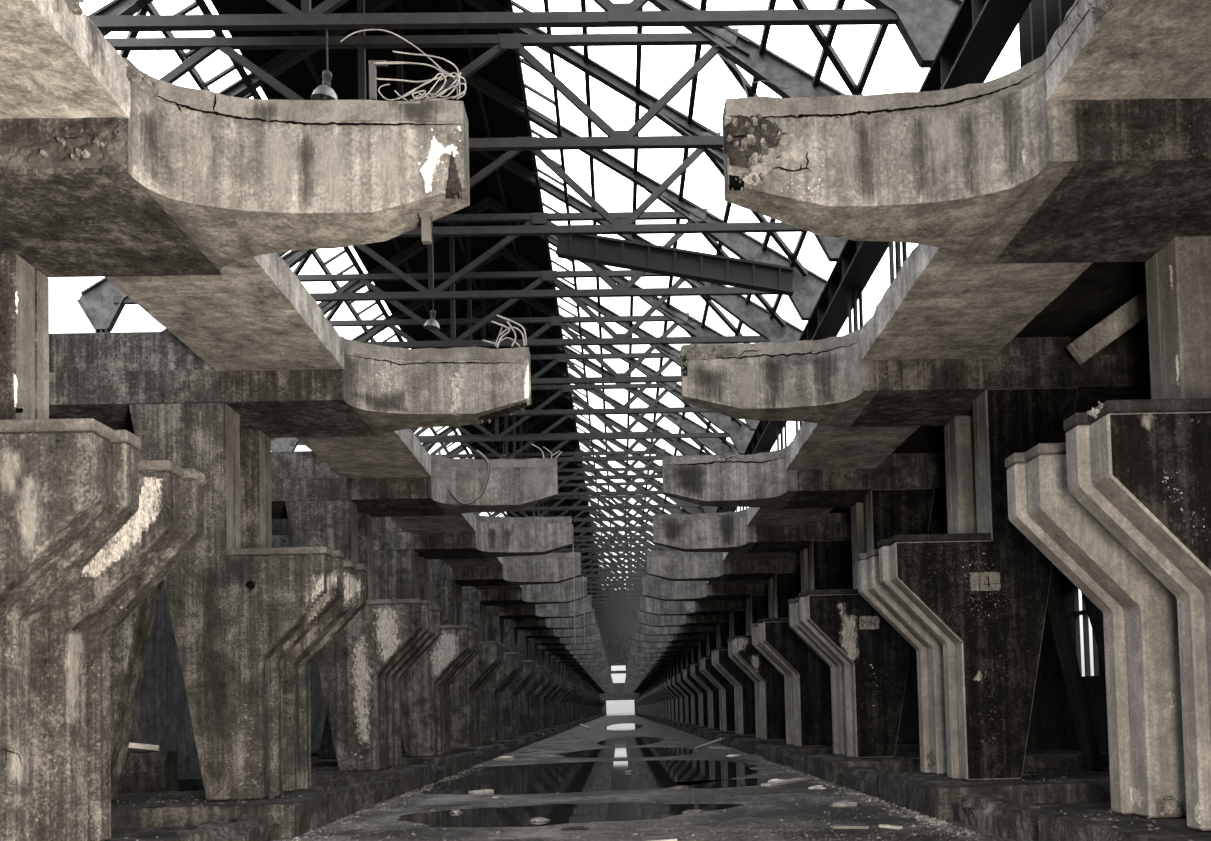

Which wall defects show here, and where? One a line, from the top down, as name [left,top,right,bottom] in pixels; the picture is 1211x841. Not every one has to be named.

spalling [66,0,84,15]
spalling [0,122,125,169]
damp [194,128,214,191]
damp [255,105,345,200]
damp [400,100,437,119]
spalling [418,126,462,199]
spalling [723,114,825,200]
crack [733,0,1096,172]
spalling [677,344,738,376]
damp [0,452,39,547]
damp [76,477,163,577]
damp [10,751,28,784]